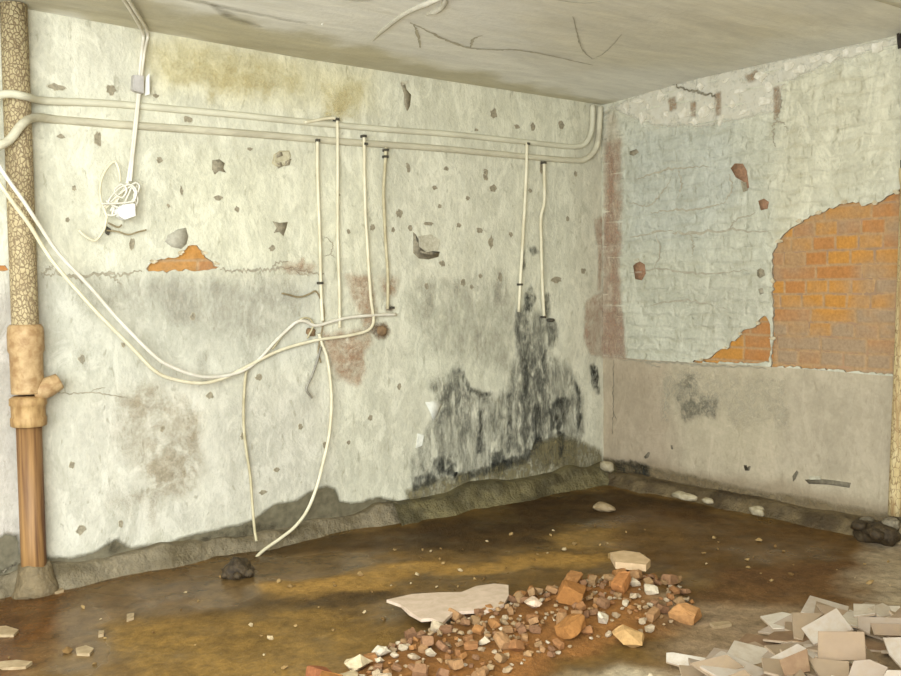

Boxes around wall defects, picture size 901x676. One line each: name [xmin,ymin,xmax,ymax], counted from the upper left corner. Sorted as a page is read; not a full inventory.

flaking render [146,228,220,272]
flaking render [694,189,900,374]
leakage [413,293,581,499]
leakage [173,486,395,542]
leakage [0,534,21,575]
leakage [47,540,150,562]